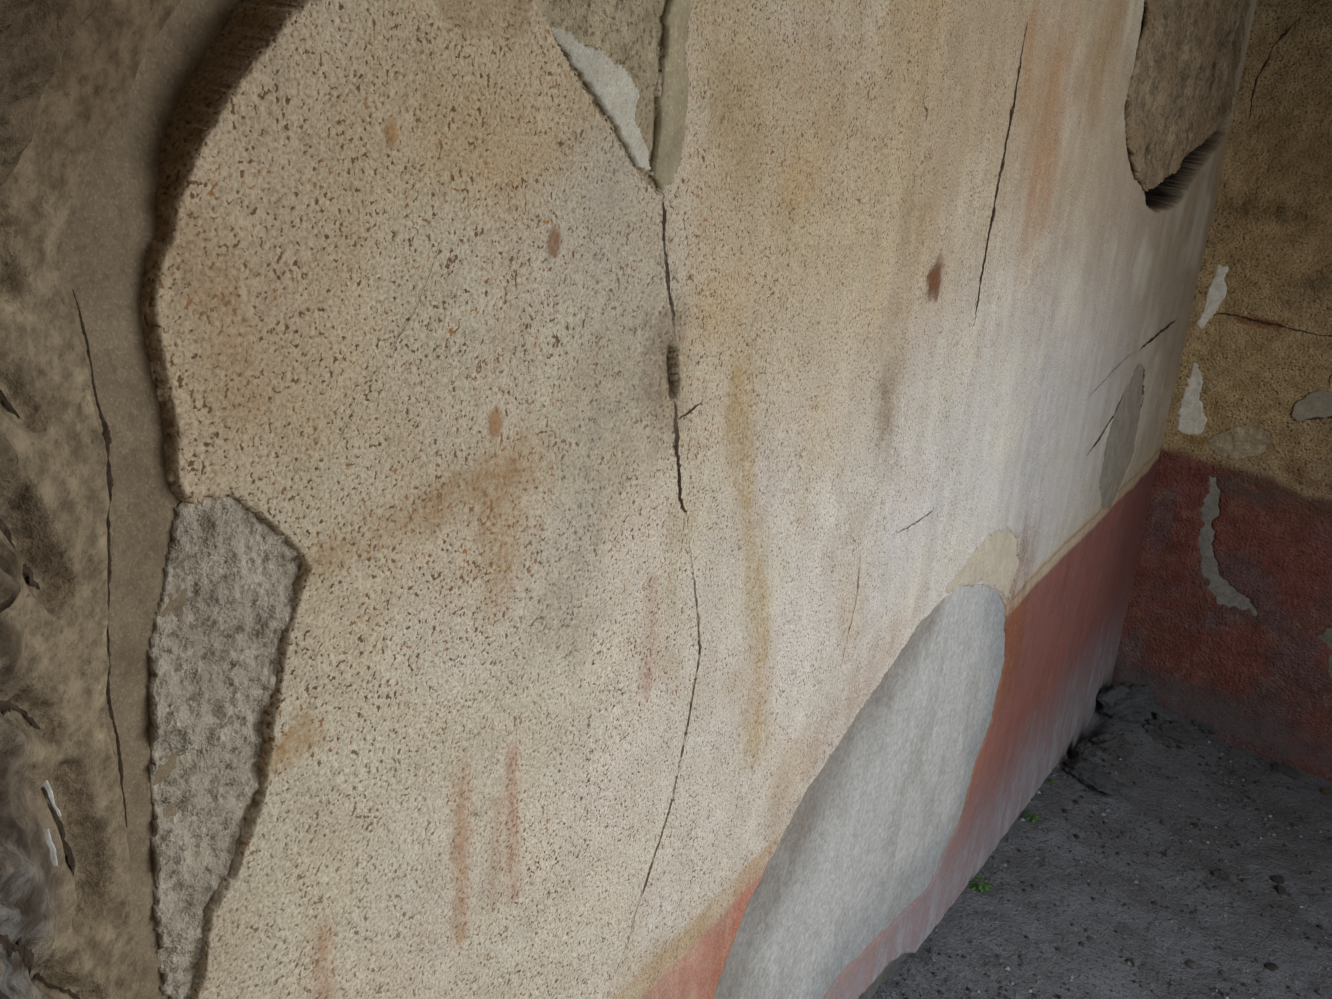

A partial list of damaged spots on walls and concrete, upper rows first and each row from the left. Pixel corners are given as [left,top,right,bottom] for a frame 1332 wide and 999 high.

crack [72,289,127,828]
flaking render [0,0,302,999]
spalling [535,0,666,193]
crack [613,402,702,978]
crack [655,189,676,338]
spalling [713,528,1019,999]
rust [928,264,941,300]
crack [974,23,1028,324]
peeling [1099,363,1144,509]
crack [1199,313,1332,337]